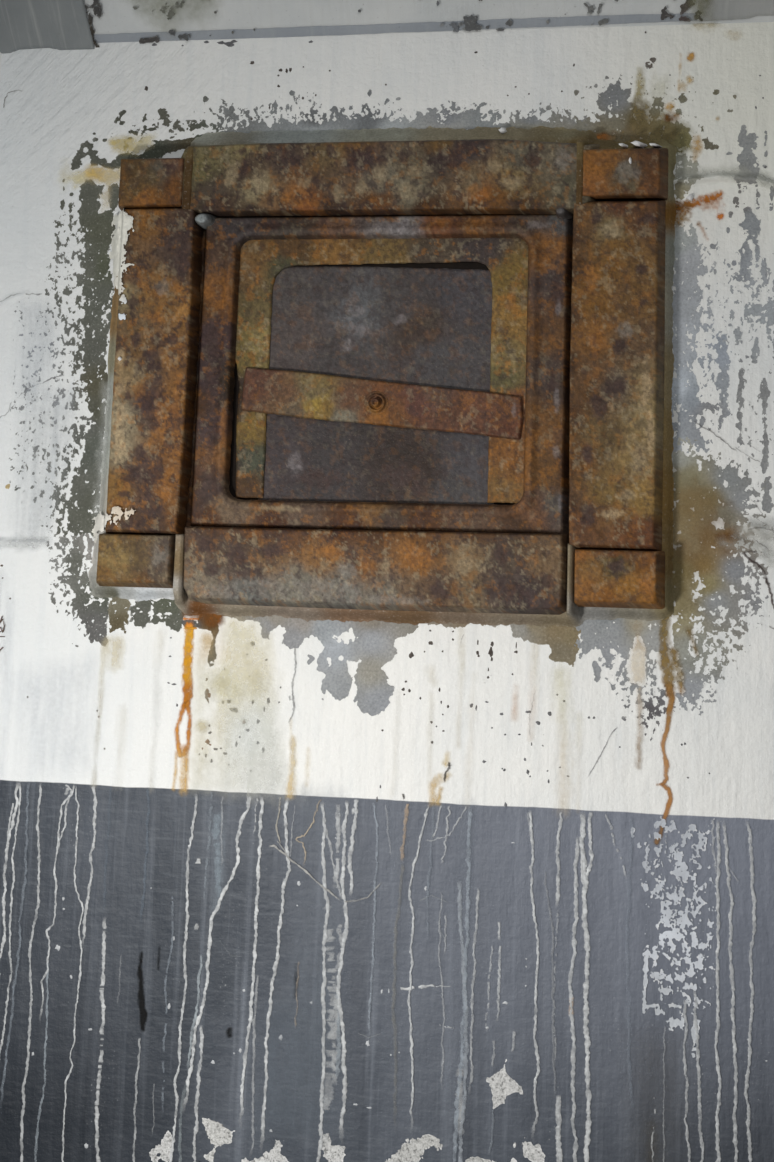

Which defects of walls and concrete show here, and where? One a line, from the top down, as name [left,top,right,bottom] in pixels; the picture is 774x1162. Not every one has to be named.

rust [675,192,722,225]
peeling [5,57,774,766]
rust [174,613,222,790]
rust [654,617,683,845]
leakage [0,785,97,1162]
leakage [95,922,106,1162]
spalling [202,1118,235,1162]
leakage [162,769,358,1162]
spalling [385,1134,443,1162]
leakage [547,813,618,1162]
peeling [631,816,717,1058]
leakage [683,821,756,1162]